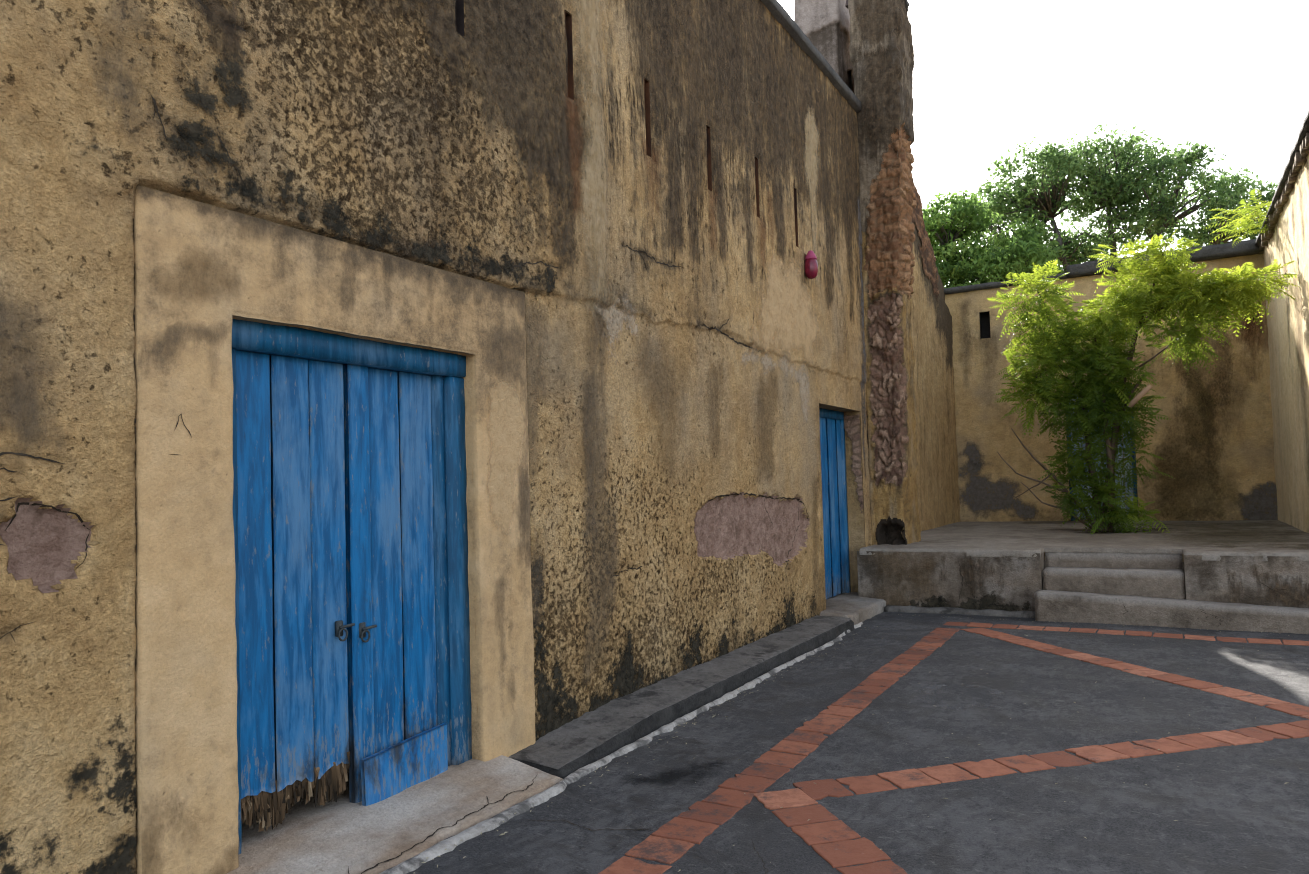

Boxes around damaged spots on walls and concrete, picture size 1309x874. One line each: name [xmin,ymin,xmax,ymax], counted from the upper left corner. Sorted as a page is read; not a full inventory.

water stain [161,0,593,312]
water stain [627,0,915,477]
crack [702,319,761,352]
flaking render [863,122,940,486]
crack [0,452,64,545]
spalling [0,498,100,593]
spalling [694,492,810,567]
water stain [521,493,816,741]
water stain [68,714,137,815]
water stain [0,831,138,874]
crack [348,775,537,874]